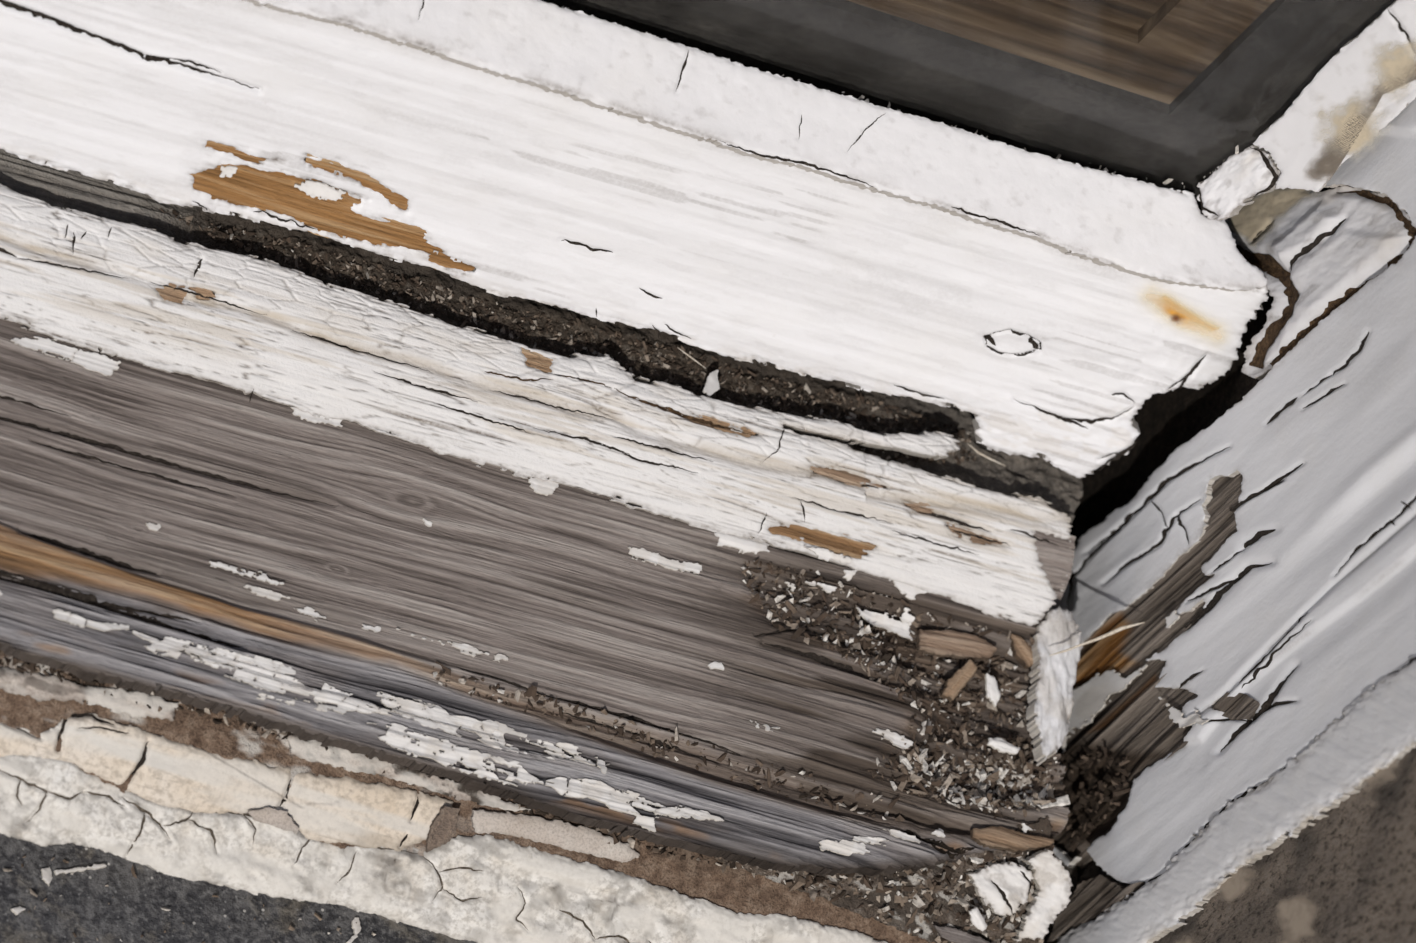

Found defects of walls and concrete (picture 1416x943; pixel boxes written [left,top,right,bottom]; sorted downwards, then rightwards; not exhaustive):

crack [0,0,259,89]
crack [1387,8,1411,43]
peeling [190,141,475,271]
corrosion [1154,297,1218,331]
peeling [714,524,876,594]
peeling [856,580,927,641]
peeling [52,609,724,834]
peeling [1053,474,1260,869]
crack [1208,615,1311,752]
crack [0,709,291,854]
crack [338,798,482,902]
peeling [819,828,945,856]